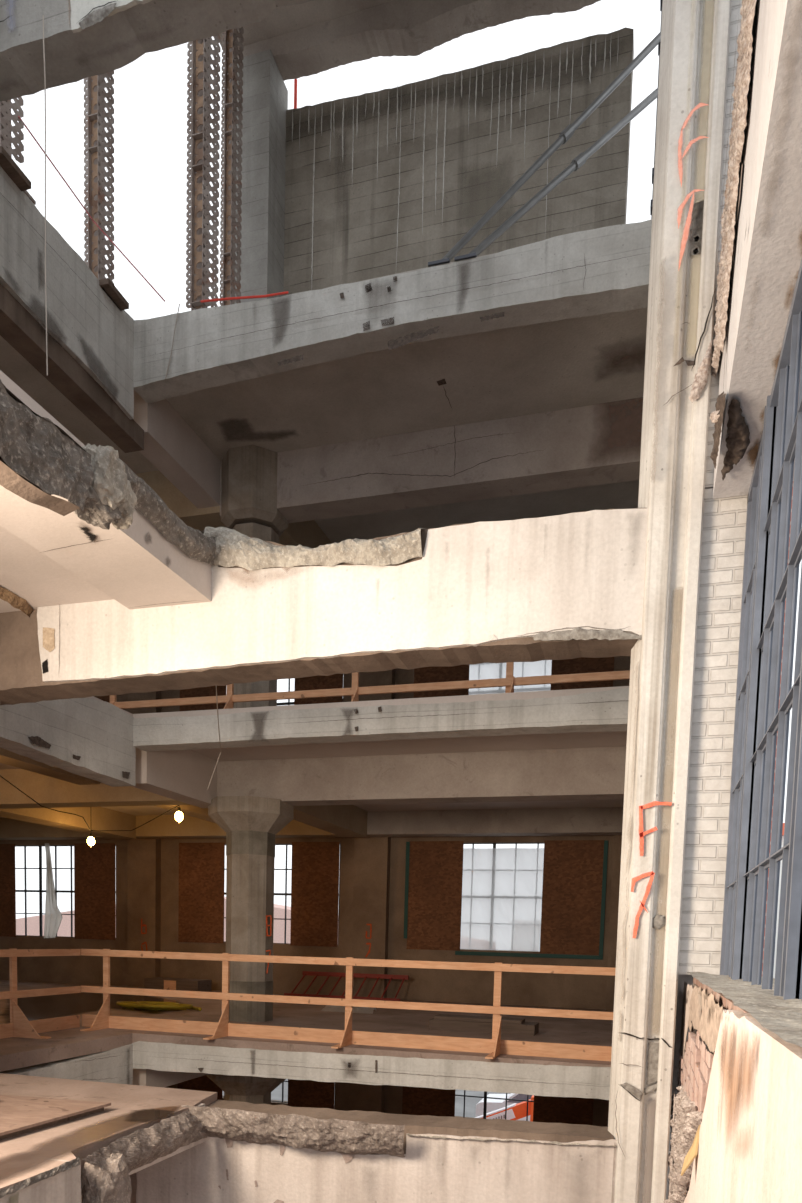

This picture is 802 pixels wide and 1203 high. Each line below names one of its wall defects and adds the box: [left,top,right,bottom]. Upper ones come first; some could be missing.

water stain [285,37,618,279]
spalling [690,201,704,256]
spalling [710,0,757,480]
water stain [274,298,288,339]
spalling [363,317,394,331]
spalling [0,379,425,570]
crack [620,992,712,1068]
spalling [0,1105,405,1203]
spalling [615,1042,659,1156]
spalling [664,982,716,1203]